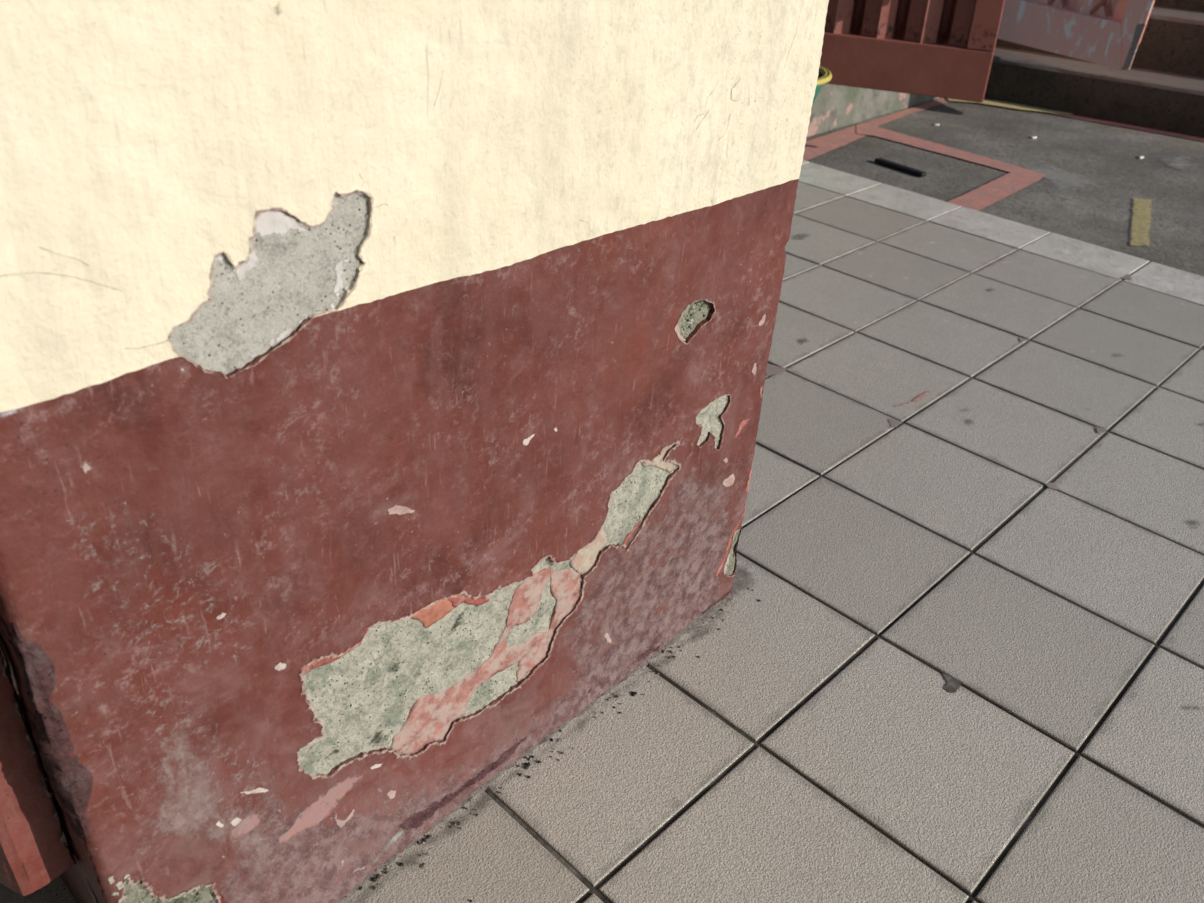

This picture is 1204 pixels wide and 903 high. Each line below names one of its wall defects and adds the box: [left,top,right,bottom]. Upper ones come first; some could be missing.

spalling [167,190,374,379]
spalling [675,299,716,344]
spalling [696,394,752,614]
spalling [278,441,681,844]
spalling [108,874,226,903]